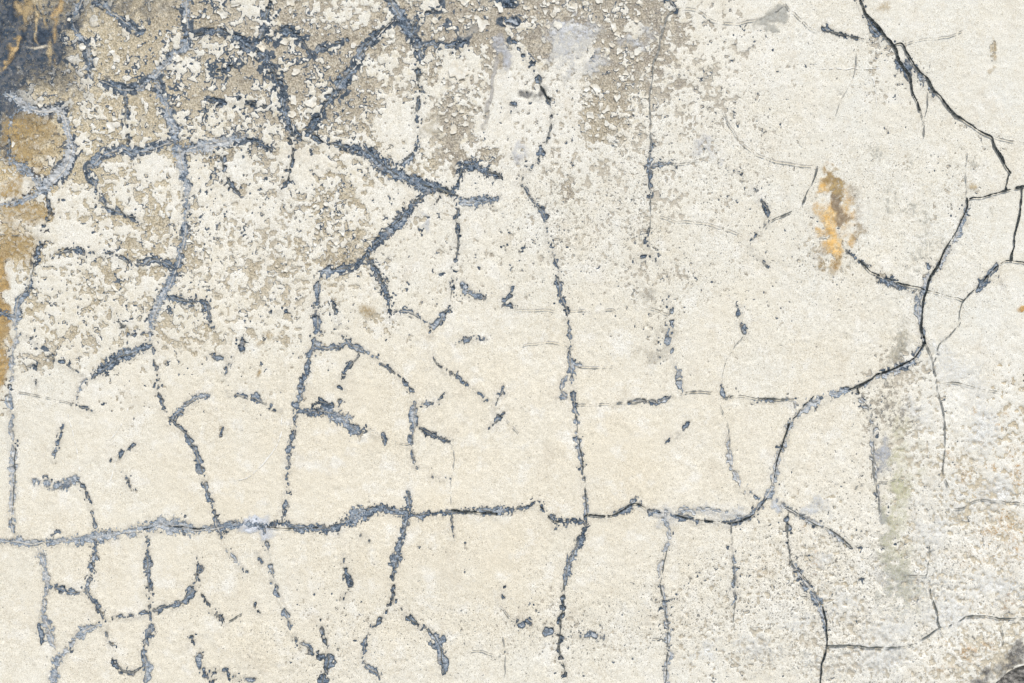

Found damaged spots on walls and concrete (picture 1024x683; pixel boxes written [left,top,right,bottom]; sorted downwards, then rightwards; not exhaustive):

crack [0,89,77,228]
crack [19,0,503,476]
peeling [0,0,864,431]
crack [511,40,554,232]
crack [644,0,864,210]
crack [721,107,818,244]
corrosion [815,172,855,270]
peeling [851,33,921,134]
crack [829,0,1024,512]
peeling [903,135,1007,231]
crack [0,241,914,683]
crack [921,589,944,640]